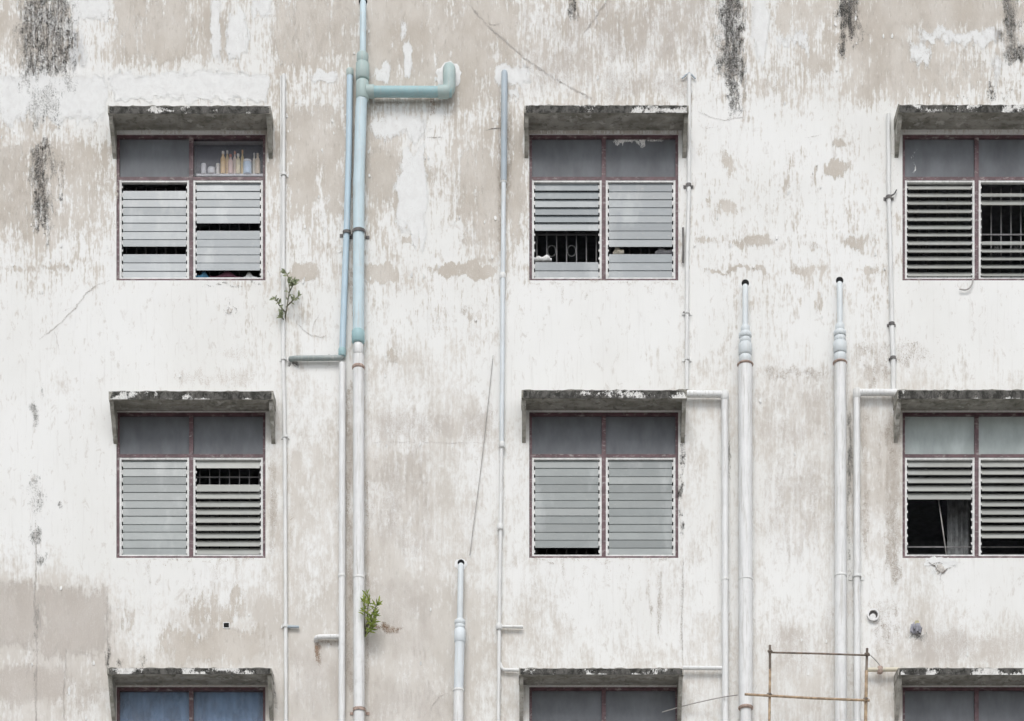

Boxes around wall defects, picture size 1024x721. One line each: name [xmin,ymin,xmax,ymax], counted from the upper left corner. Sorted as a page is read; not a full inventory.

peeling [366,0,522,118]
crack [471,6,591,98]
leakage [712,0,810,118]
leakage [833,0,865,56]
leakage [899,0,1024,112]
leakage [0,0,273,246]
peeling [364,136,528,285]
crack [40,284,98,346]